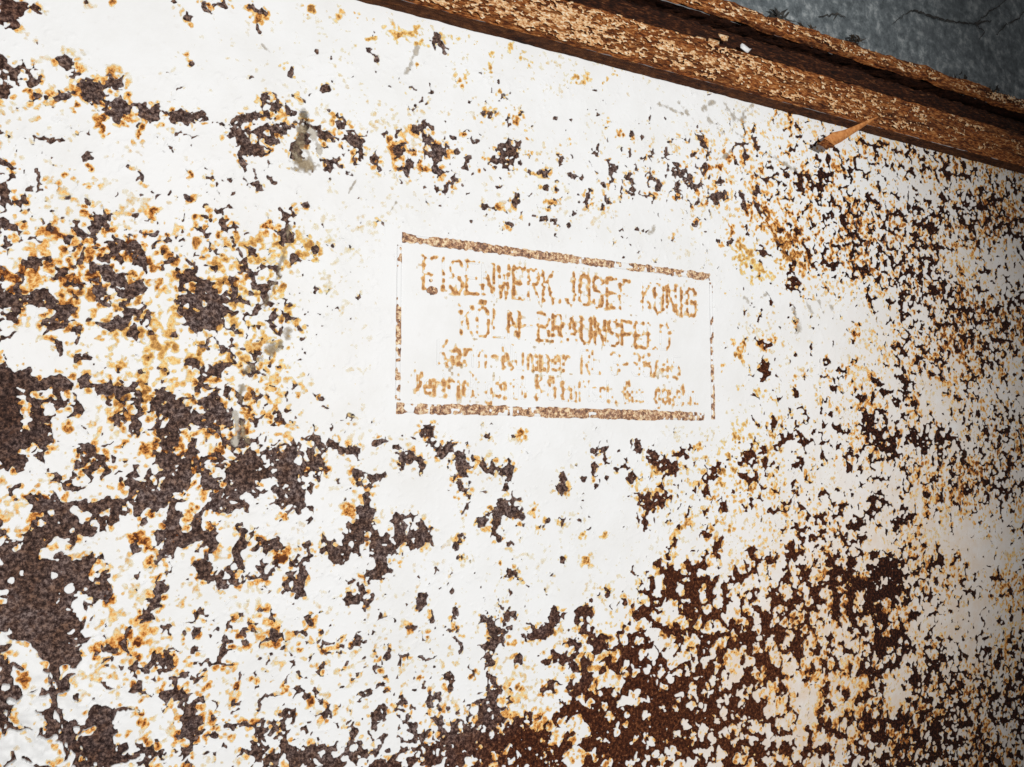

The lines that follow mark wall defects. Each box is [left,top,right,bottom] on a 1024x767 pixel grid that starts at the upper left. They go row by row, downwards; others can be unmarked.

rust [171,0,193,28]
rust [24,126,106,145]
rust [179,106,205,125]
rust [43,151,104,200]
rust [716,194,840,290]
rust [242,276,343,429]
peeling [580,442,610,490]
peeling [371,420,590,588]
peeling [181,601,219,645]
peeling [393,587,436,643]
peeling [443,603,468,658]
peeling [396,653,412,679]